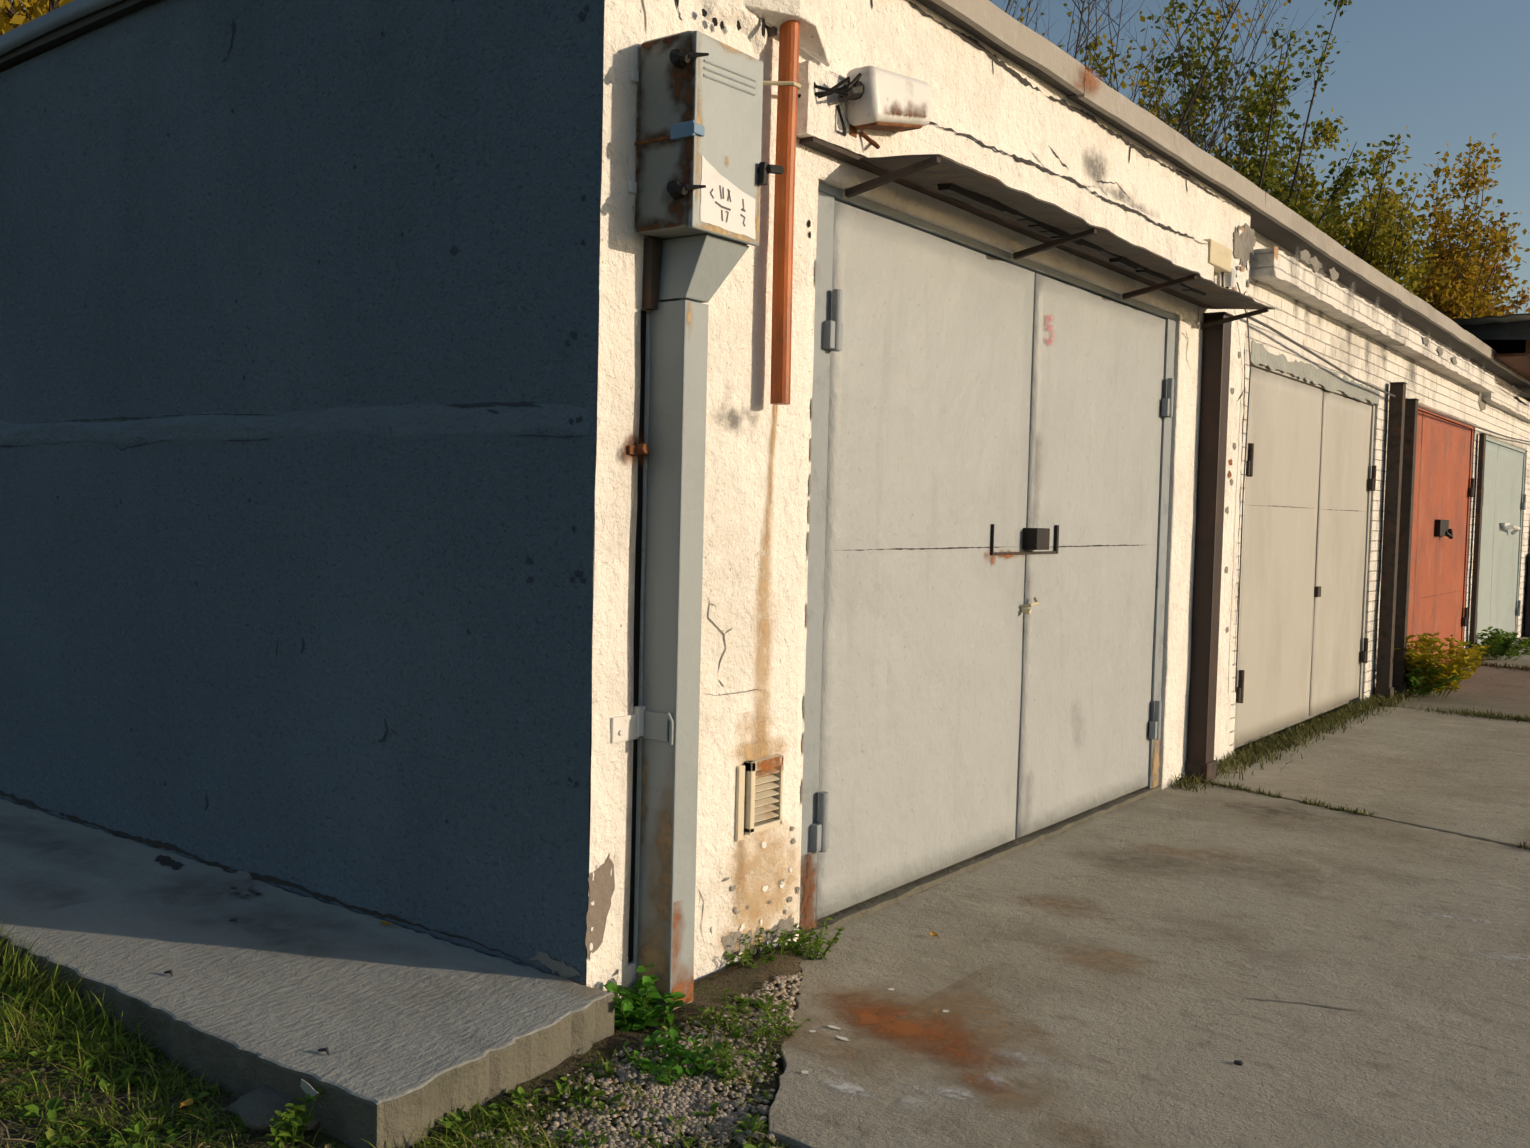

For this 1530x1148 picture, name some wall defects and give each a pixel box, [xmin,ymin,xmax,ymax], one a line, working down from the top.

crack [871,0,1239,244]
crack [449,401,587,438]
rust [618,440,649,459]
spalling [633,310,646,714]
crack [702,595,765,696]
rust [740,405,782,774]
peeling [529,739,638,978]
rust [837,991,1037,1105]